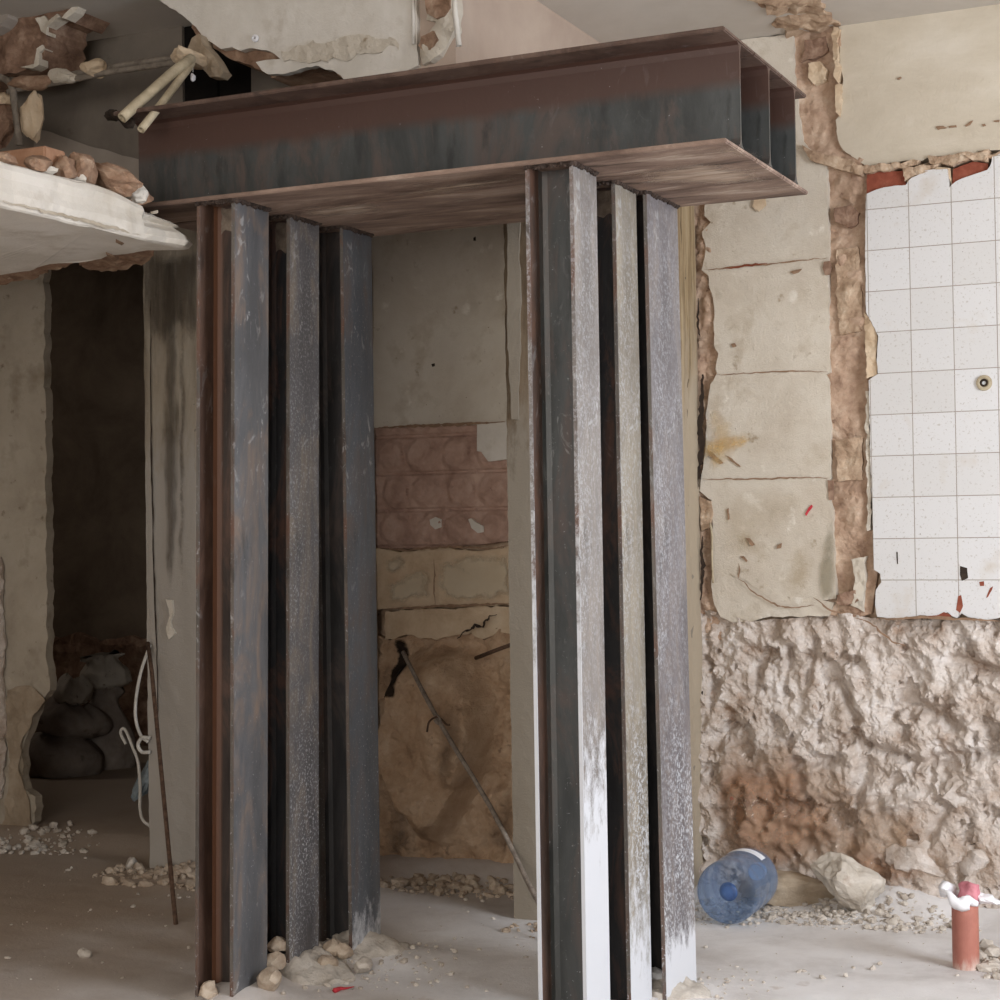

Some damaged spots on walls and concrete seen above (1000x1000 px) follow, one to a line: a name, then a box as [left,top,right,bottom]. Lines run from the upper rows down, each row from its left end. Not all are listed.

flaking render [22,7,86,72]
spalling [747,0,843,117]
flaking render [34,130,139,180]
spalling [802,145,1000,182]
spalling [0,250,154,285]
peeling [823,247,878,379]
damp [166,340,183,559]
spalling [694,205,741,640]
peeling [828,391,873,531]
crack [380,545,509,639]
peeling [837,556,868,612]
spalling [384,640,408,697]